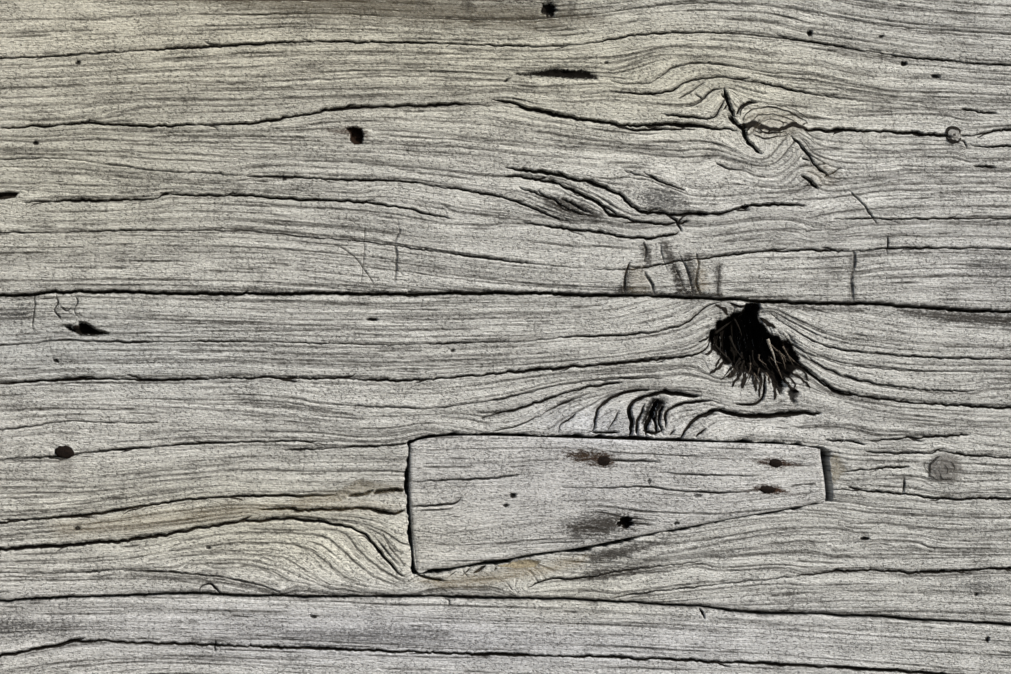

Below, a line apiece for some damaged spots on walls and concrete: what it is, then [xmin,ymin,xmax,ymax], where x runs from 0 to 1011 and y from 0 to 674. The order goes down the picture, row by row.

crack [0,62,849,171]
crack [24,108,1011,240]
crack [0,229,1011,271]
crack [0,295,724,346]
crack [1,340,819,437]
crack [770,313,1011,410]
crack [0,420,406,460]
corrosion [566,448,615,471]
crack [598,460,750,494]
crack [826,434,1011,501]
crack [0,475,517,605]
crack [529,560,1011,617]